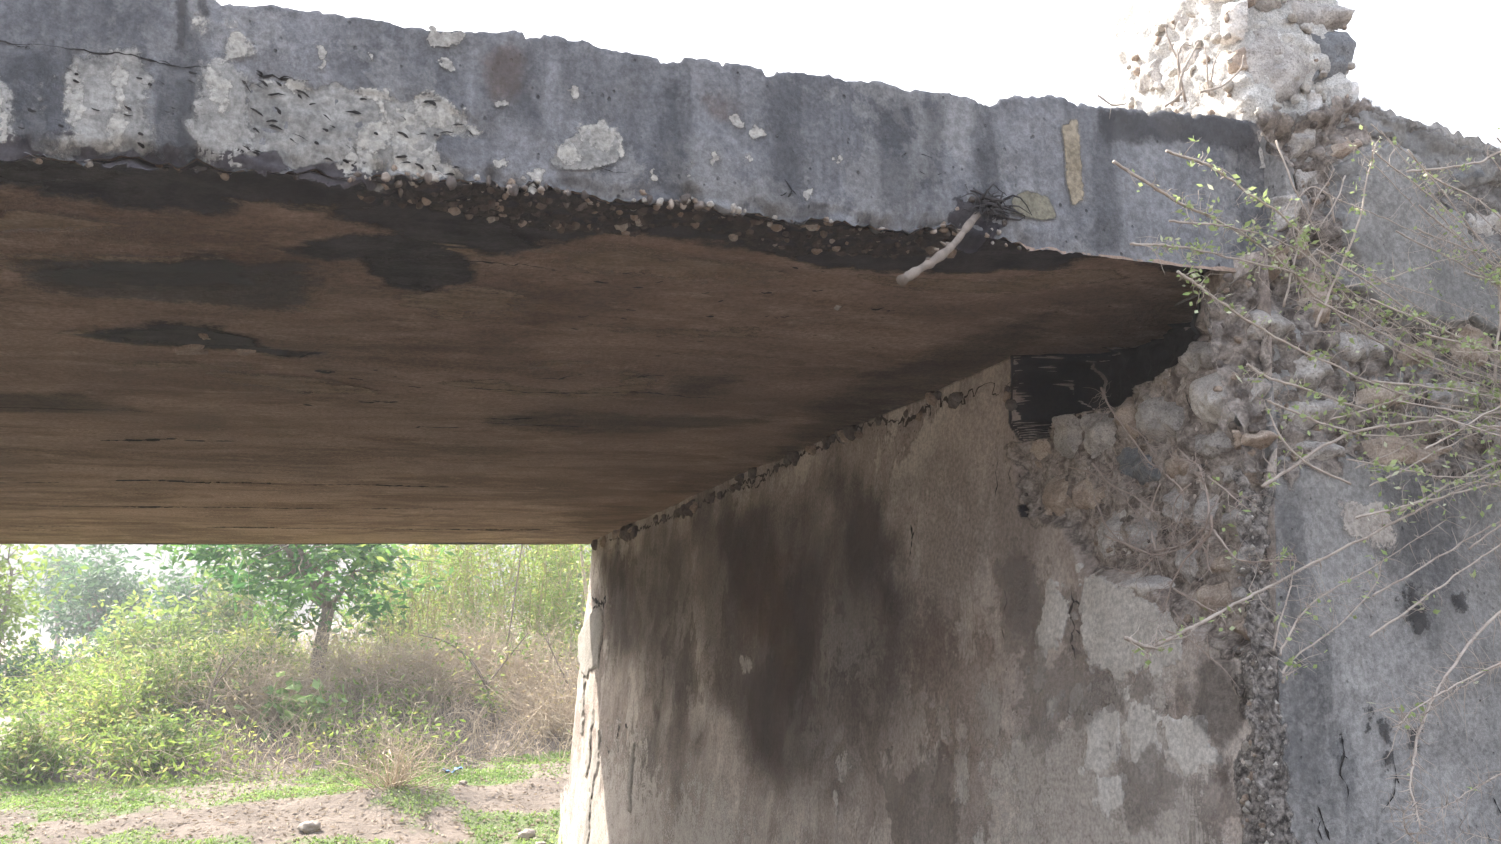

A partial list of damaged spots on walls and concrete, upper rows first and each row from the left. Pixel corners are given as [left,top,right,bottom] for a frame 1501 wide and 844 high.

peeling [192,16,207,32]
crack [0,40,309,82]
leakage [0,157,1107,311]
leakage [1140,262,1210,275]
leakage [75,321,319,358]
flaking render [936,95,1501,844]
leakage [1395,583,1431,635]
leakage [1451,592,1469,613]
leakage [1364,707,1423,766]